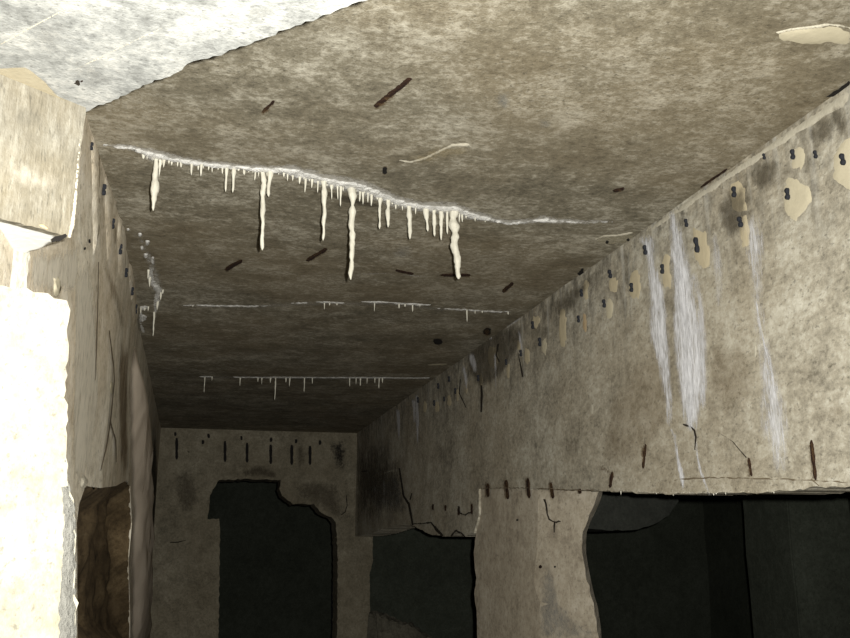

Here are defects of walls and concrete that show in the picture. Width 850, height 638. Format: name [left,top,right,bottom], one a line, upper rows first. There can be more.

rust [374,78,412,108]
water stain [127,228,164,335]
crack [103,144,607,280]
peeling [605,277,618,319]
water stain [645,214,705,428]
peeling [693,228,710,269]
flaking render [646,81,850,247]
spalling [58,473,131,638]
crack [483,487,593,532]
crack [683,424,697,450]
water stain [632,449,757,496]
water stain [763,339,784,456]